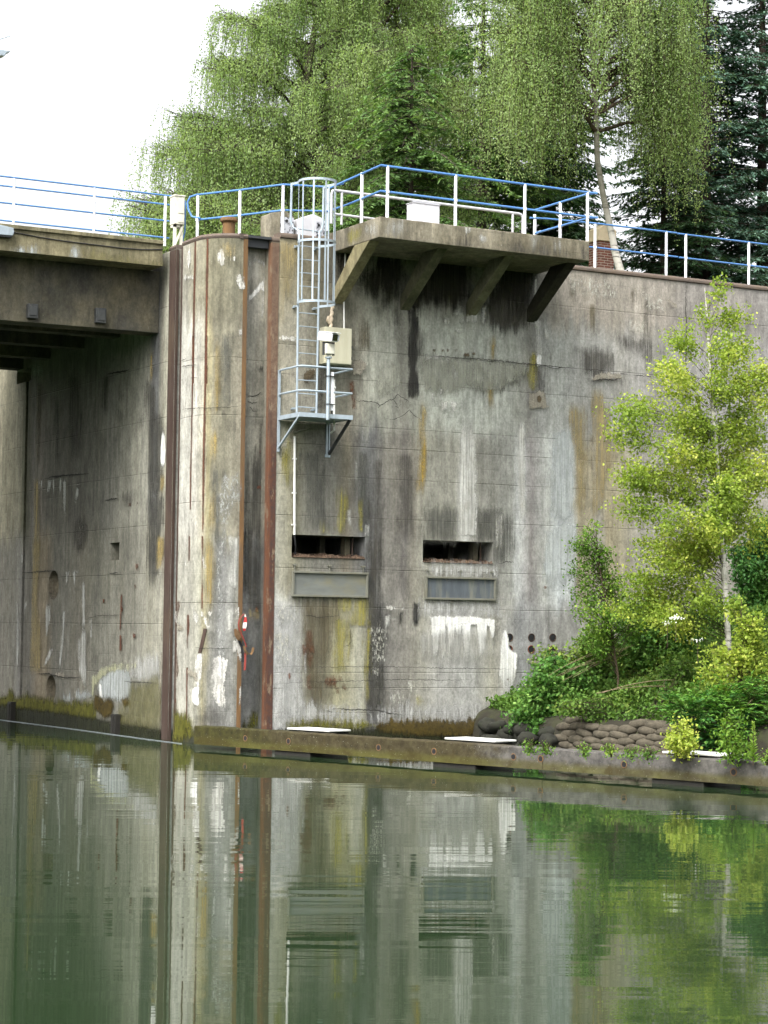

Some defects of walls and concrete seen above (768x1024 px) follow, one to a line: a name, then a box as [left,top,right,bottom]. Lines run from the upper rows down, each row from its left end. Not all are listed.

water stain [335,253,350,275]
water stain [360,257,406,301]
water stain [397,263,549,398]
crack [355,394,423,421]